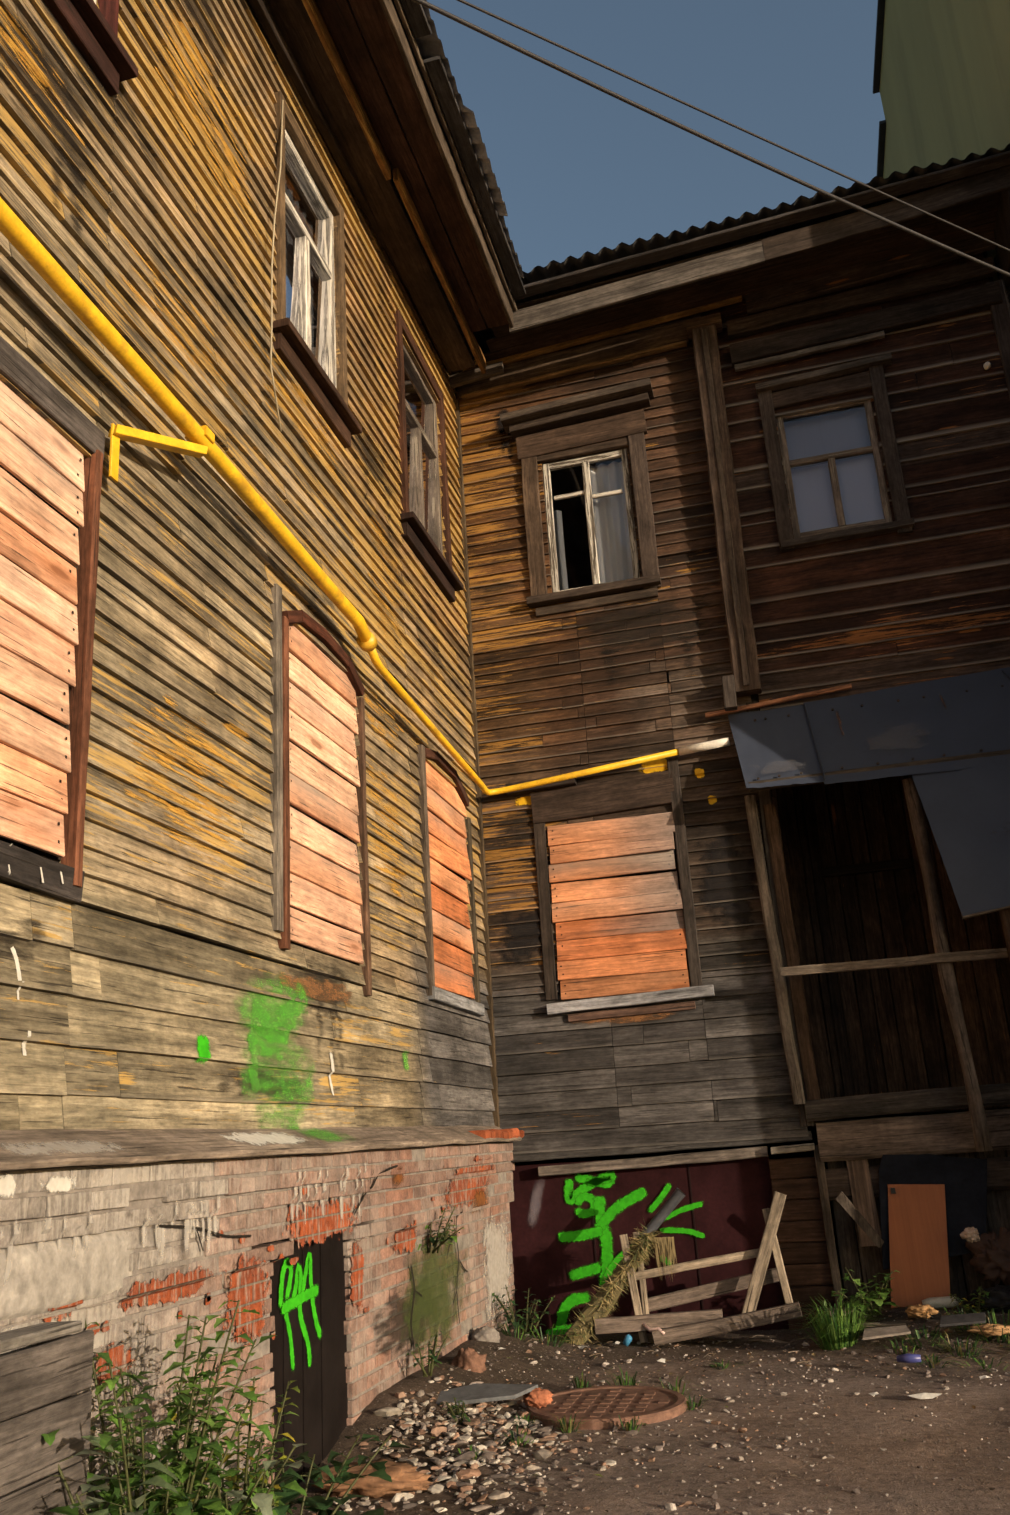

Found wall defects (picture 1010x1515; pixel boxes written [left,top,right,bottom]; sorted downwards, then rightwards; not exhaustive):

flaking render [432,1128,524,1212]
flaking render [386,1220,419,1255]
flaking render [44,1300,84,1322]
flaking render [86,1186,370,1385]
damp [375,1279,439,1355]
spalling [450,1347,487,1373]